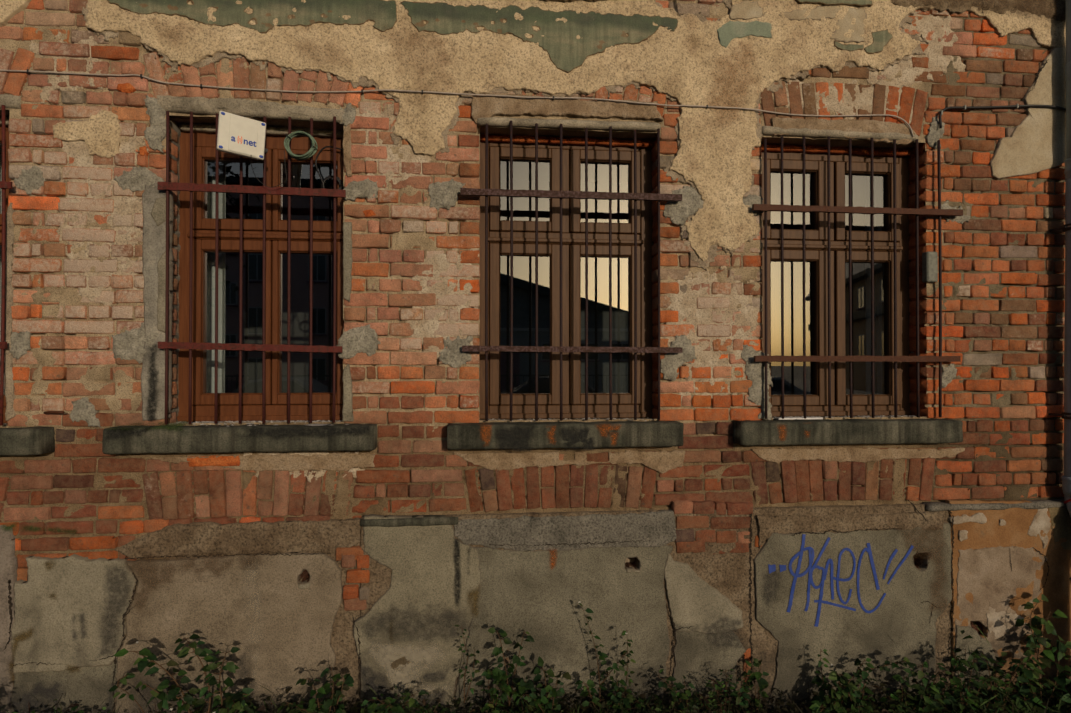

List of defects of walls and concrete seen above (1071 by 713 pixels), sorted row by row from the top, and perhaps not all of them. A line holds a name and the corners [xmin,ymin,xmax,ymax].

peeling [0,0,32,27]
peeling [53,110,121,158]
peeling [80,0,1066,271]
crack [4,580,54,666]
damp [362,539,478,709]
peeling [0,499,1071,713]